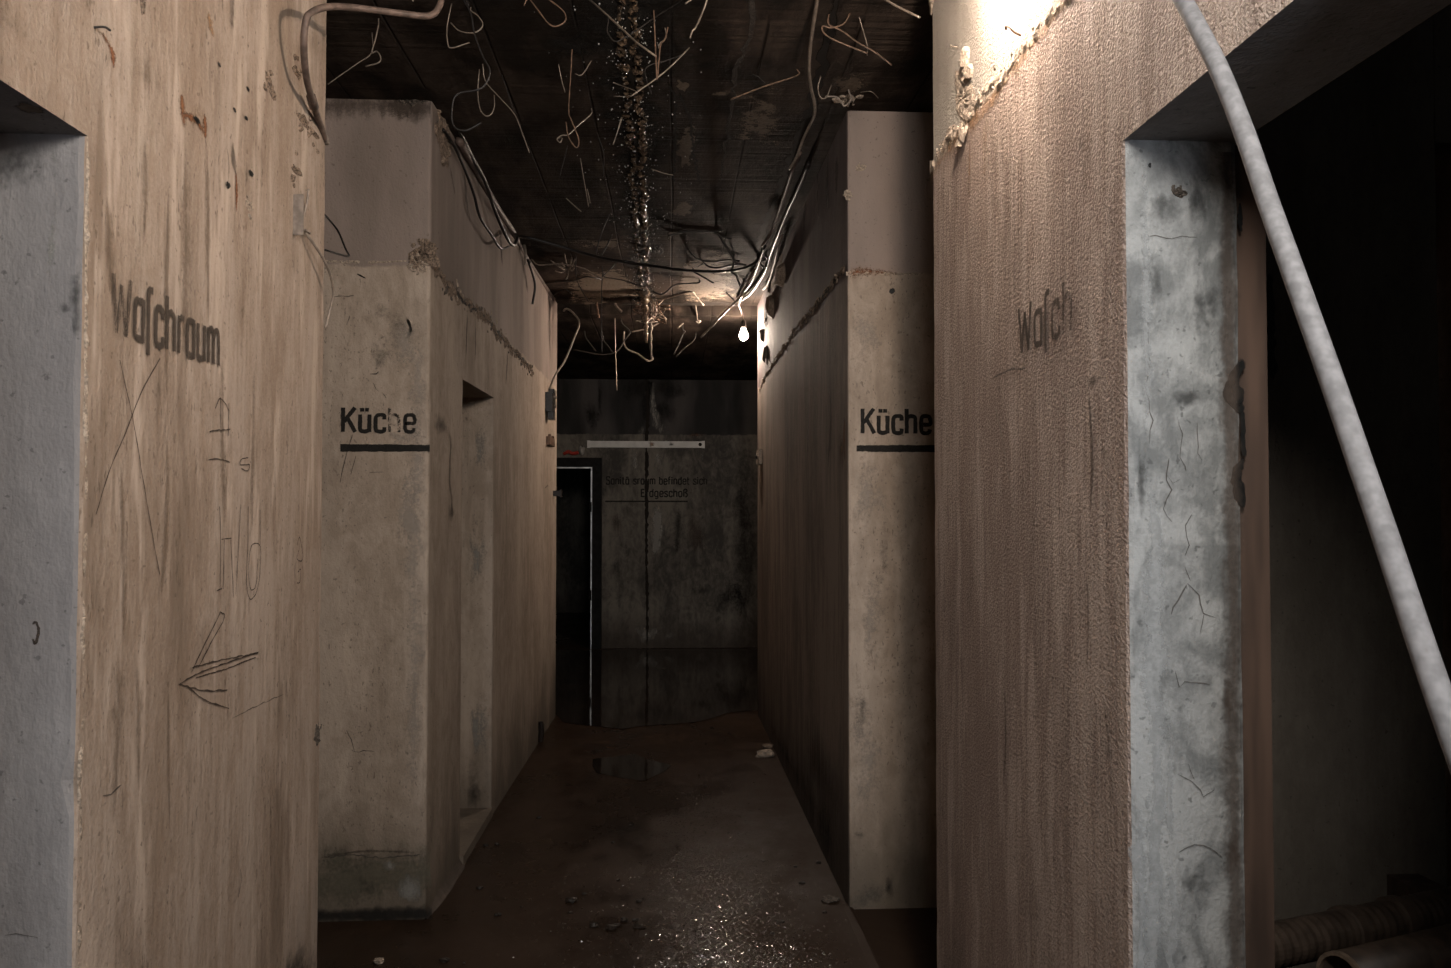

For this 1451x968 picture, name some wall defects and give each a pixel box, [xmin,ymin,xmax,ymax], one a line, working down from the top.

peeling [932,11,1054,169]
spalling [406,238,440,275]
crack [1146,321,1213,632]
crack [1180,844,1221,856]